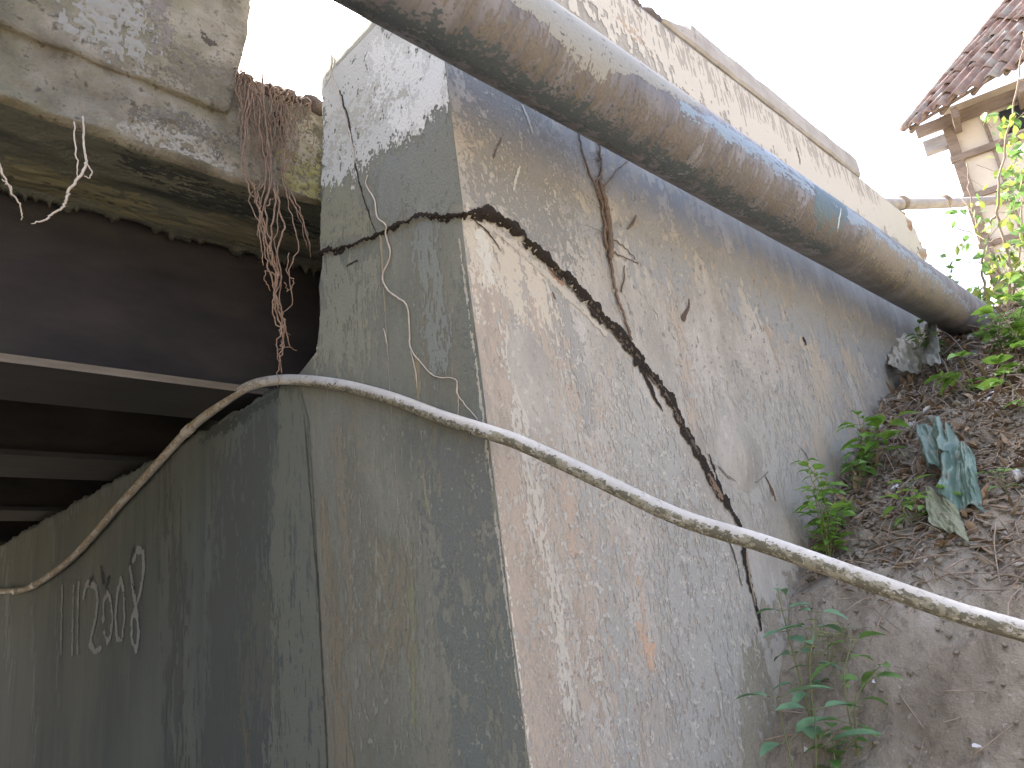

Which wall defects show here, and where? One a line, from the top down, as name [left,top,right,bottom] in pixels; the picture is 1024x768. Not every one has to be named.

damp [113,63,914,549]
crack [313,90,768,631]